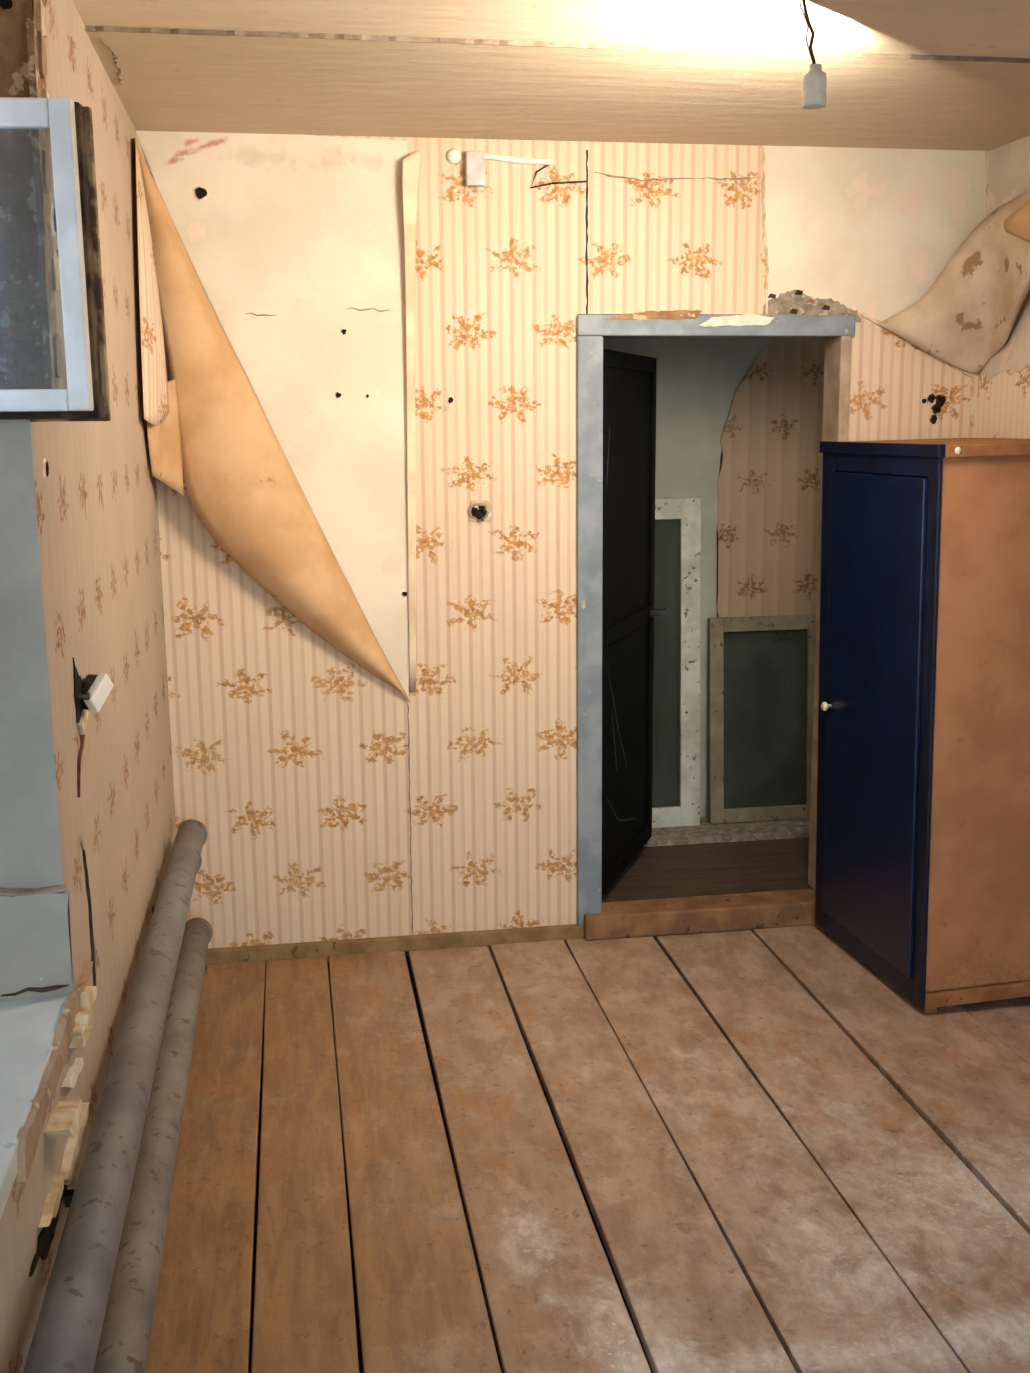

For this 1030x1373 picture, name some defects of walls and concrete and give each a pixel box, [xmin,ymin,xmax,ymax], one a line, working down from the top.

flaking render [0,0,50,98]
flaking render [31,130,64,389]
flaking render [136,131,410,702]
flaking render [605,146,986,645]
crack [77,732,86,798]
flaking render [16,961,97,1227]